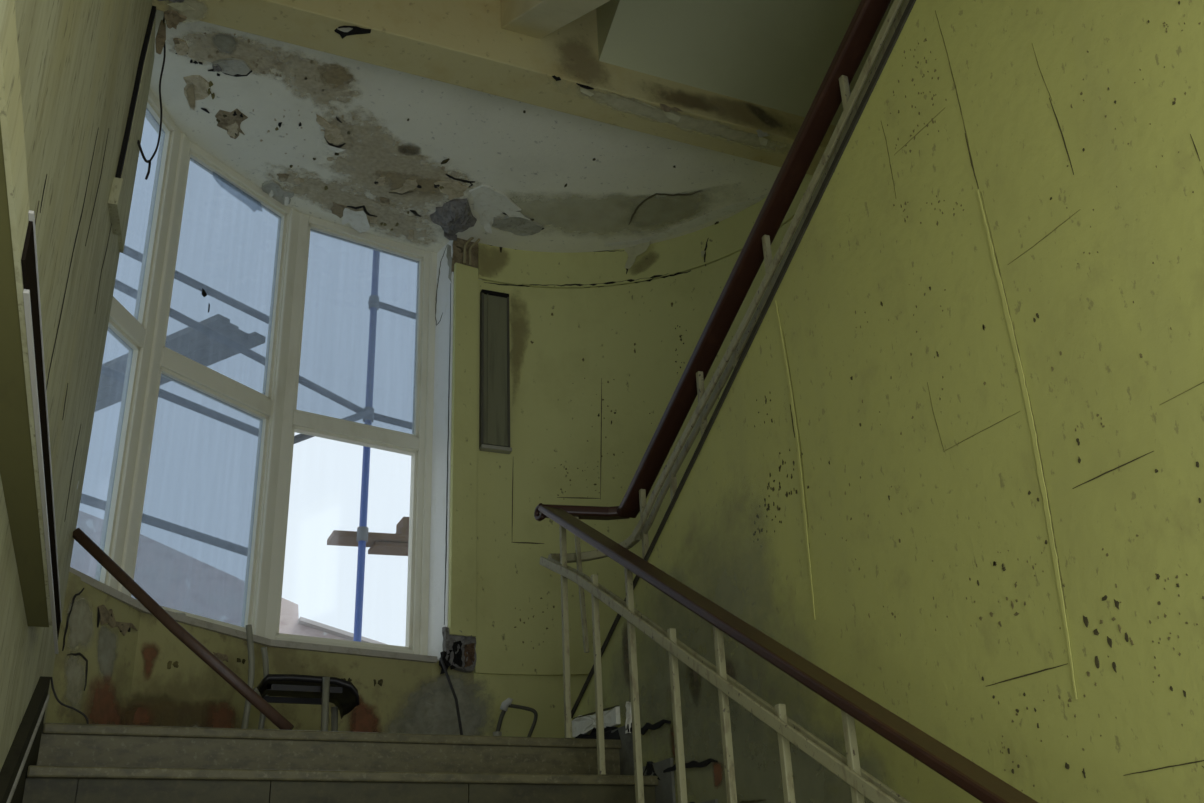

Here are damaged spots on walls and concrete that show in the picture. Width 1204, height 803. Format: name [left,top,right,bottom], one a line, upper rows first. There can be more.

spalling [334,26,371,39]
peeling [260,110,356,206]
peeling [331,158,544,326]
crack [484,238,709,288]
crack [594,190,703,252]
crack [881,11,1153,699]